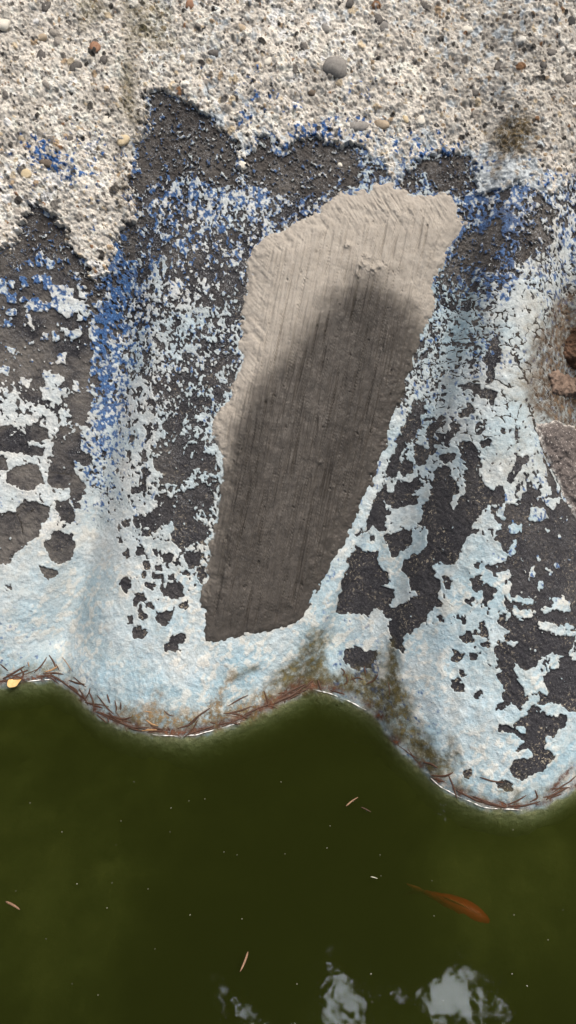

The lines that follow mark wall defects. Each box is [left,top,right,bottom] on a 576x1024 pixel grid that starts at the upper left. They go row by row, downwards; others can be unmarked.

peeling [0,90,576,792]
water stain [0,675,56,684]
water stain [80,679,244,736]
water stain [257,679,359,712]
water stain [431,778,520,810]